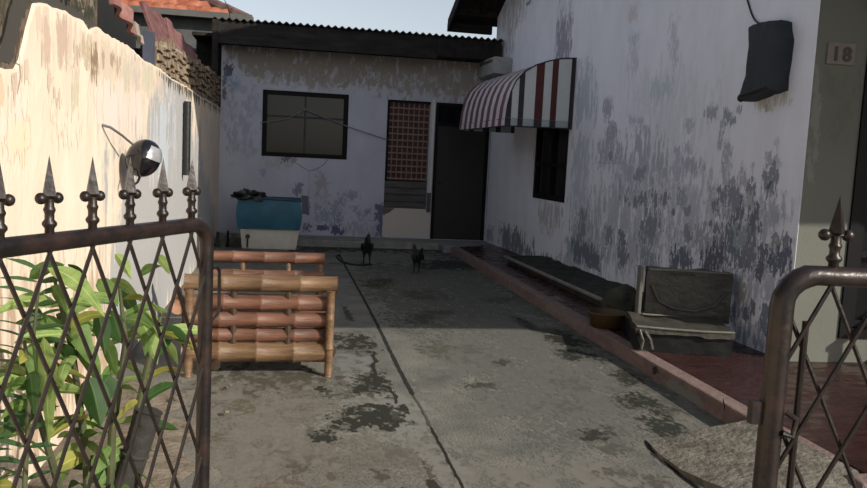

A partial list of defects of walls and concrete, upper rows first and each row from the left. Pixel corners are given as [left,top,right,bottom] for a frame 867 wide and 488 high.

damp [292,167,408,238]
damp [210,246,725,488]